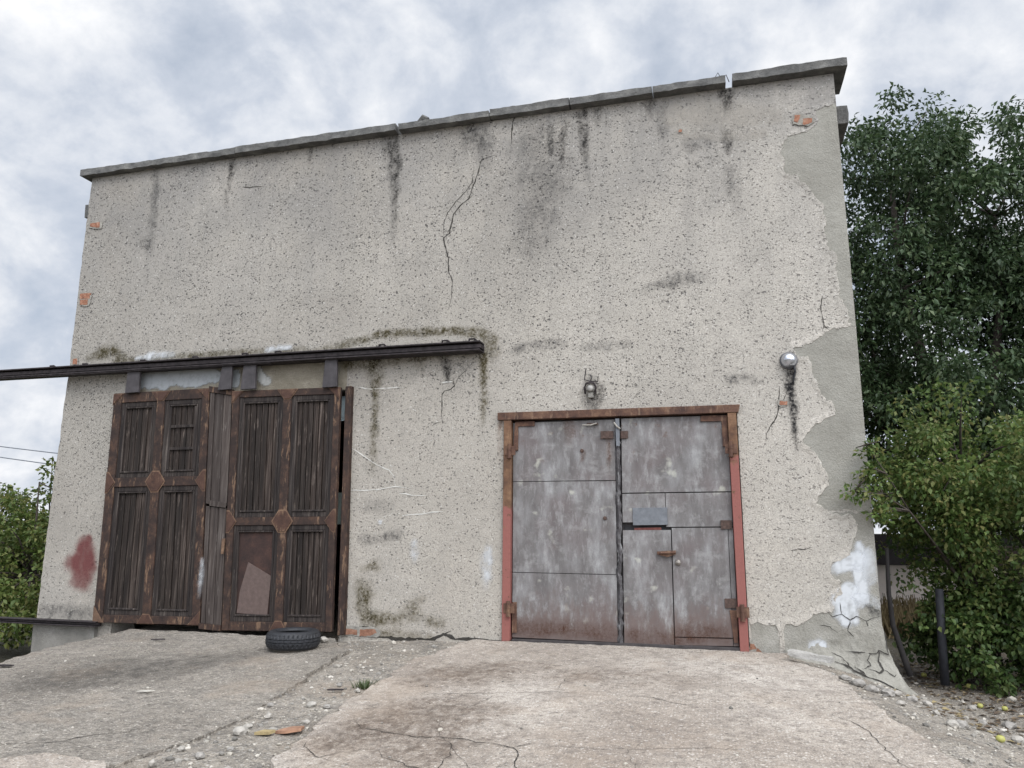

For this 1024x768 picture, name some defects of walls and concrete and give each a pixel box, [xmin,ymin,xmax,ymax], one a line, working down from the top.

crack [443,117,515,306]
leakage [785,368,798,448]
flaking render [749,100,882,653]
leakage [832,548,874,627]
crack [821,604,903,692]